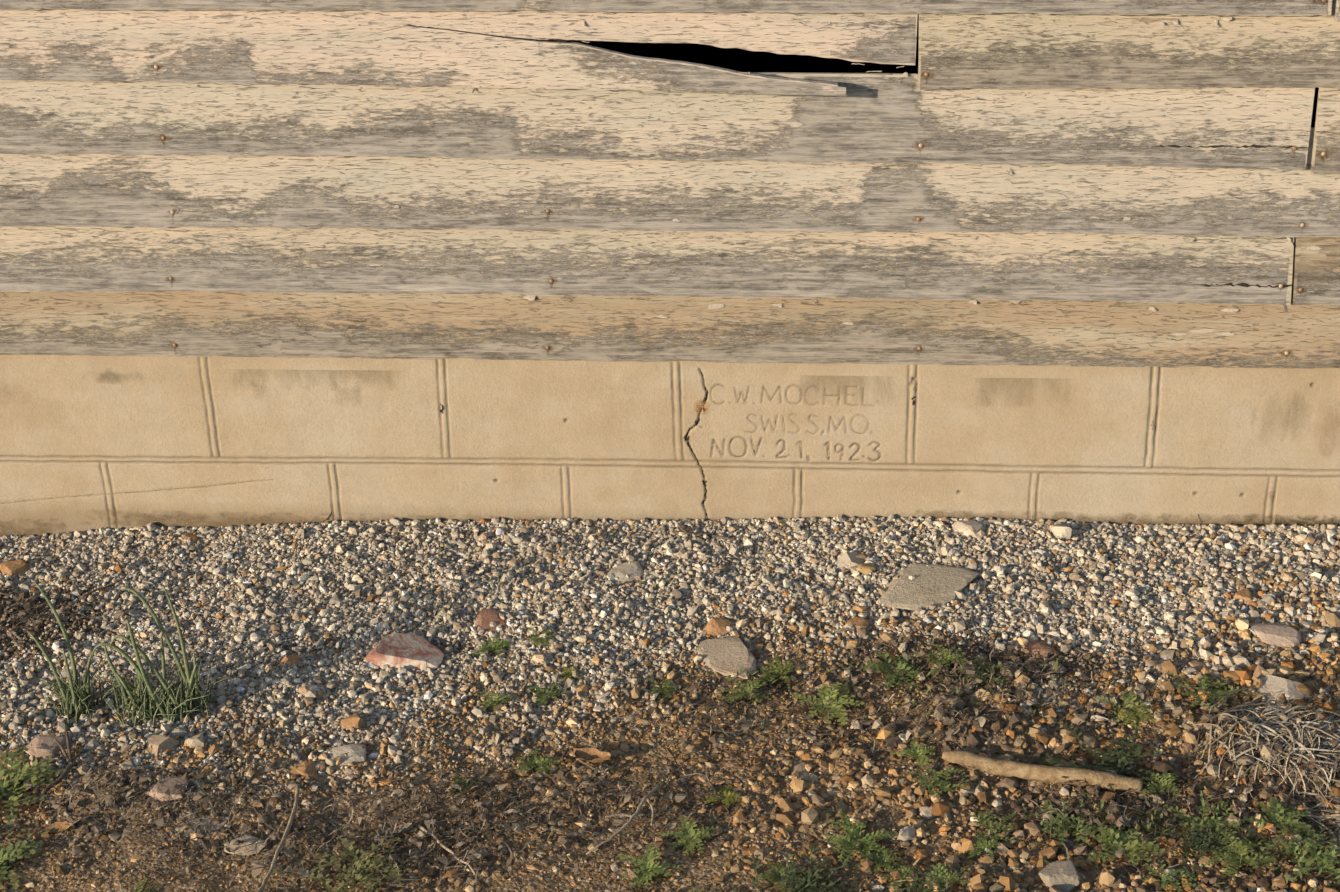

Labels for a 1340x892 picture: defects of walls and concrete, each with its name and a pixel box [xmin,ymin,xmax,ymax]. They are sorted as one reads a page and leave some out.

crack [404,24,590,45]
crack [683,372,708,516]